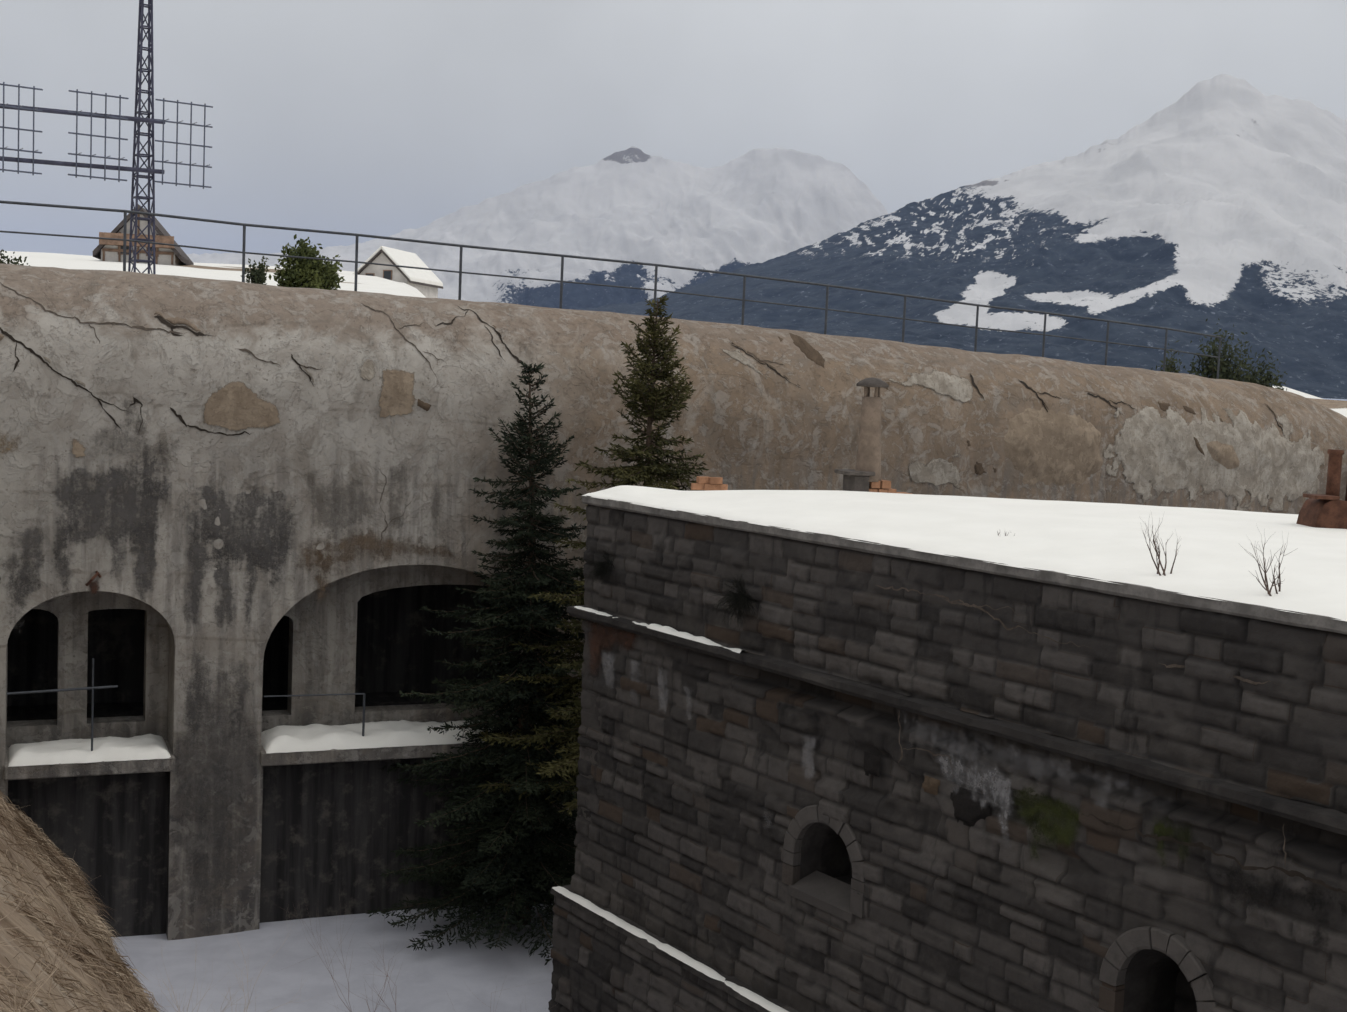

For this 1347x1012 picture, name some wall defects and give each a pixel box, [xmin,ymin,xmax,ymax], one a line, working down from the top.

crack [0,327,250,436]
crack [0,282,320,386]
crack [363,304,531,386]
crack [970,374,985,401]
crack [1018,379,1135,416]
leakage [8,451,169,628]
spalling [922,776,992,827]
leakage [939,756,1011,830]